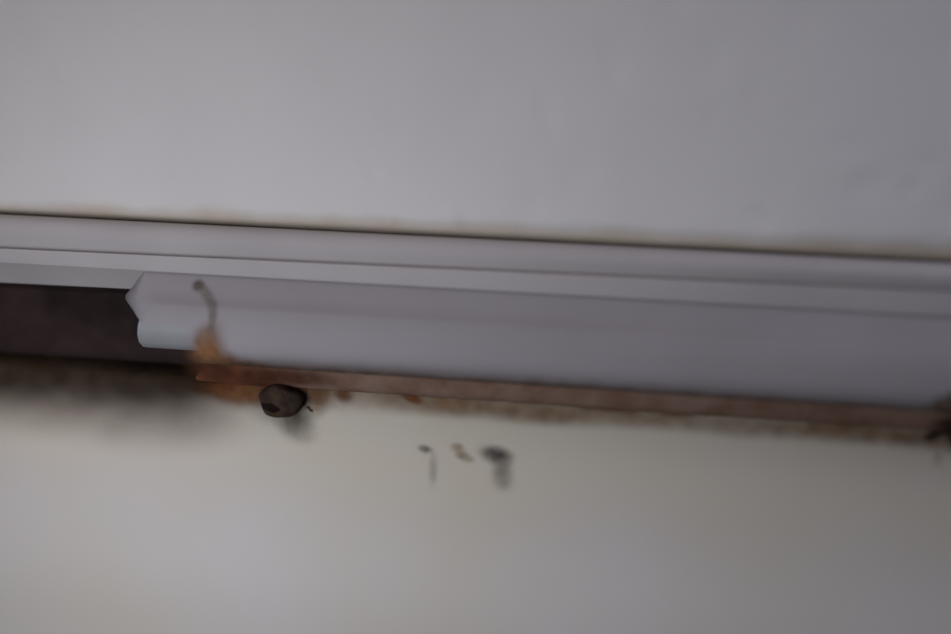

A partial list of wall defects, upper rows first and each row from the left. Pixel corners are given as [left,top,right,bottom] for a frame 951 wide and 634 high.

damp [488,450,504,459]